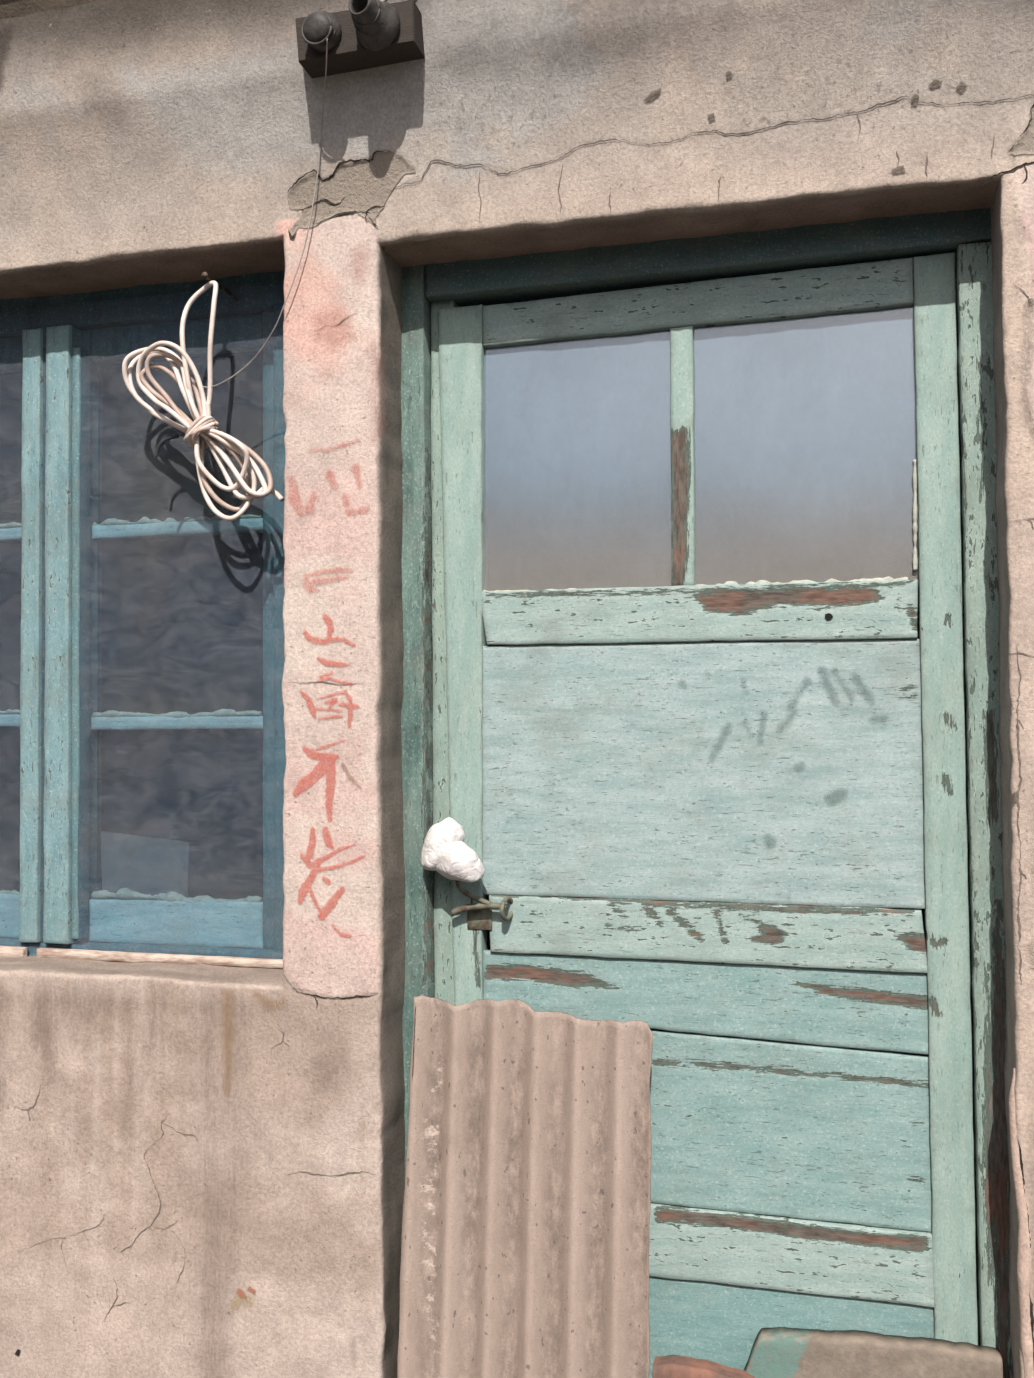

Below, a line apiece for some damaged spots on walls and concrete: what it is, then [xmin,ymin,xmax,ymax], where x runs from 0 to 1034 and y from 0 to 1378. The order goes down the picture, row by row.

spalling [287,150,416,238]
crack [394,94,1034,221]
spalling [1007,104,1034,155]
crack [33,1213,106,1272]
crack [107,1116,200,1314]
crack [296,1169,364,1177]